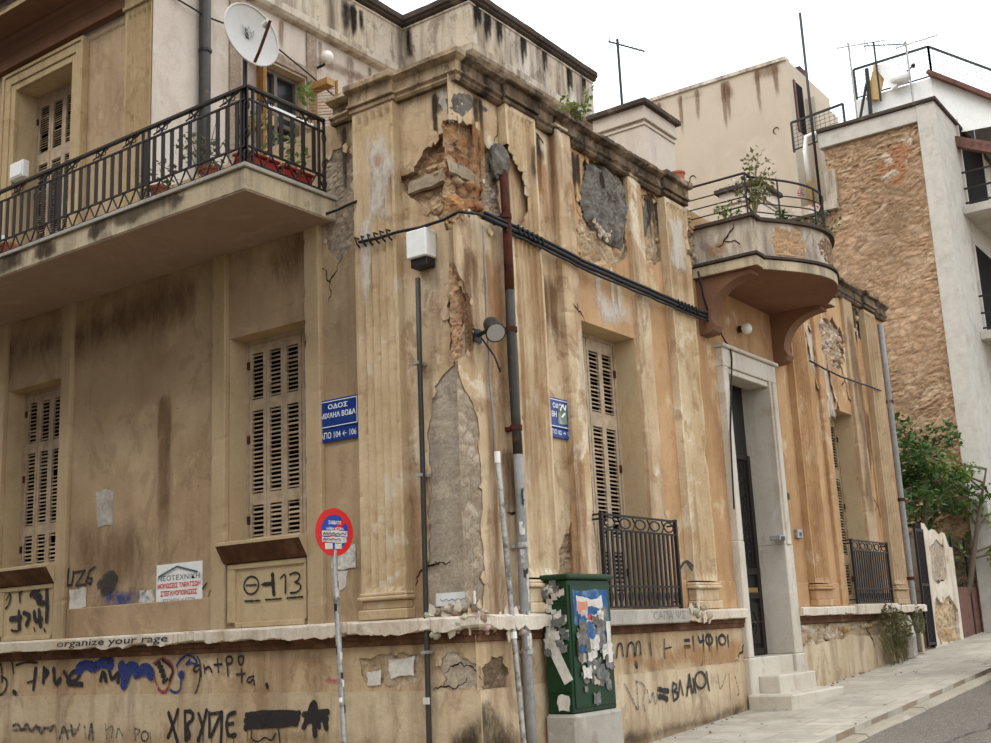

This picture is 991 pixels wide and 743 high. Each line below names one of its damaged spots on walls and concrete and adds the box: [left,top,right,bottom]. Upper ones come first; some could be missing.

damp [474,4,503,45]
damp [567,68,586,92]
spalling [400,115,500,236]
spalling [576,156,624,266]
spalling [805,308,861,419]
spalling [360,262,527,691]
spalling [929,539,948,581]
spalling [934,595,959,644]